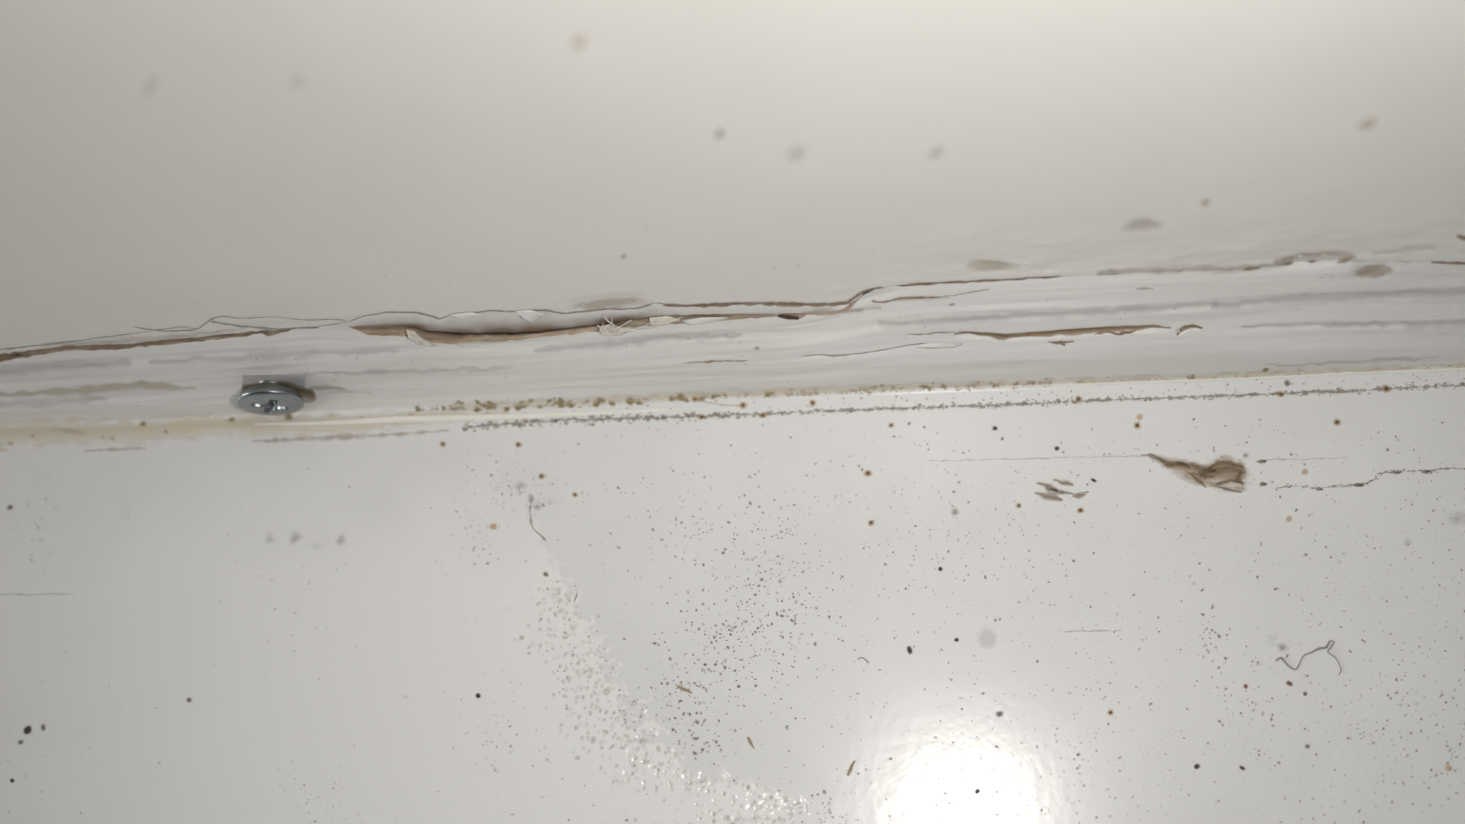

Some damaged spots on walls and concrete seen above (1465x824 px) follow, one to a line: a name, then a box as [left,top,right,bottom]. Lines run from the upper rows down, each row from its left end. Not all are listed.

crack [1432,259,1465,267]
crack [0,276,1203,362]
peeling [0,457,809,824]